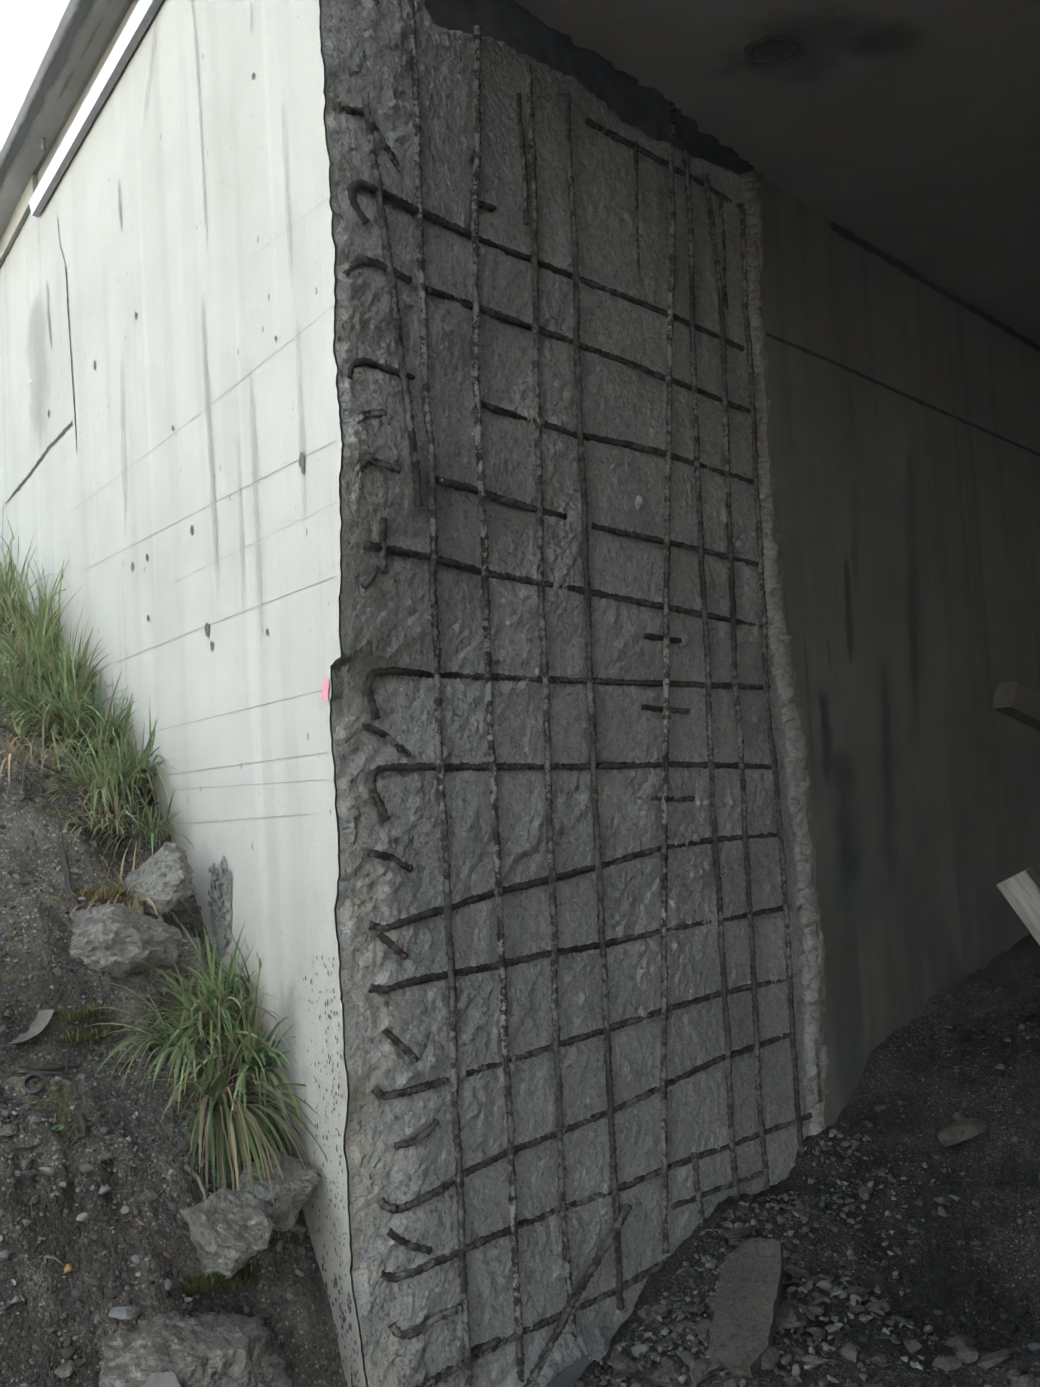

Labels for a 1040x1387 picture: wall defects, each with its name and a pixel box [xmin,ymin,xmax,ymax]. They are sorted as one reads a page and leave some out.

spalling [321,0,830,1387]